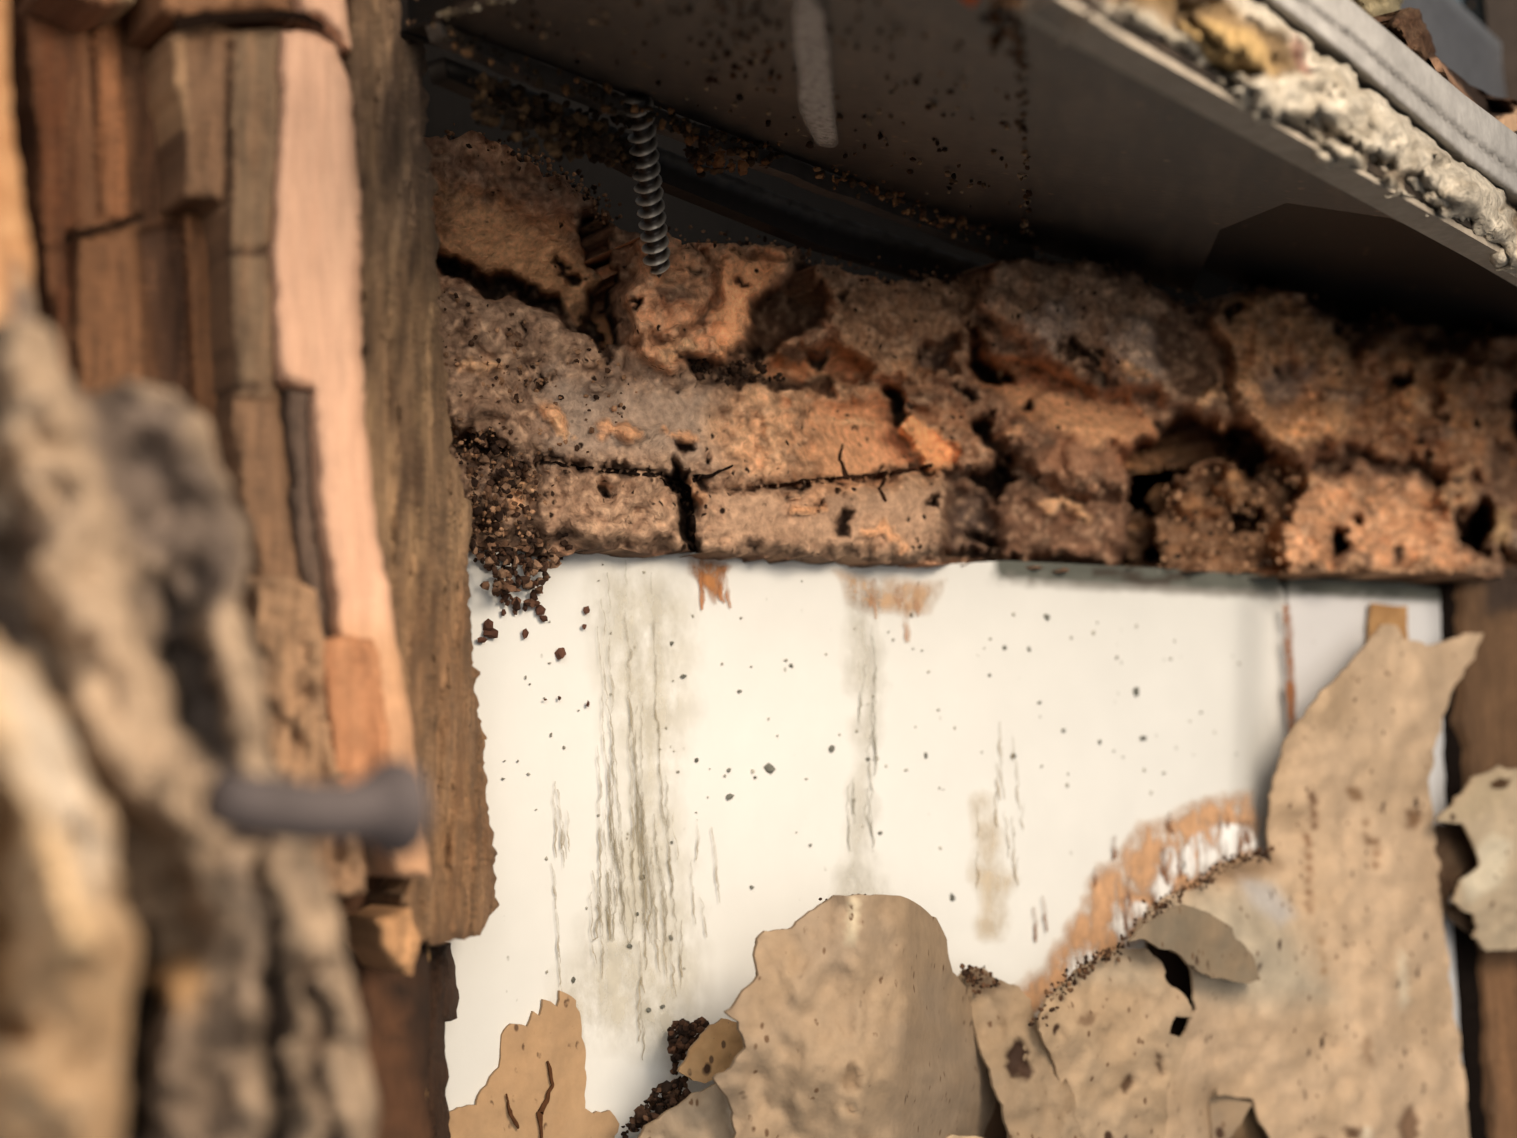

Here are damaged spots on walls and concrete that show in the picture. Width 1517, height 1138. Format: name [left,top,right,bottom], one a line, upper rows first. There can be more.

crack [172,9,325,32]
crack [540,444,933,551]
leakage [751,762,776,779]
leakage [545,821,570,861]
leakage [586,679,712,1060]
peeling [946,603,1483,1138]
peeling [637,1018,743,1138]